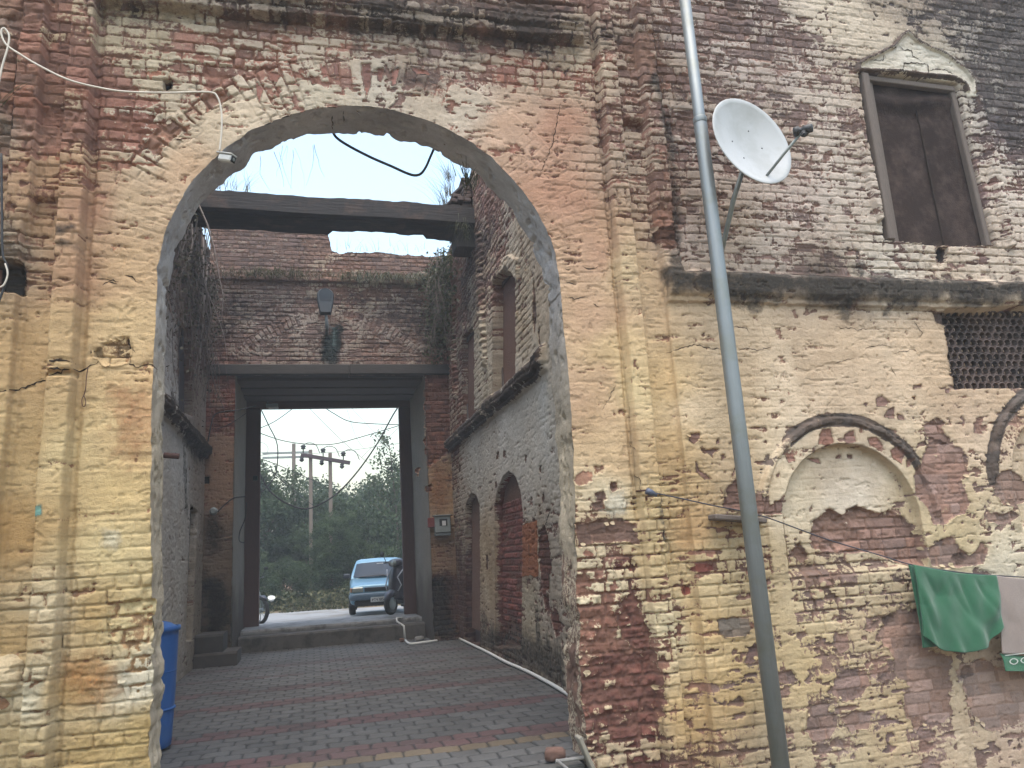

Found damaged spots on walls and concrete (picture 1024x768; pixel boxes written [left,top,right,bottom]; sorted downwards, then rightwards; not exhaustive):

peeling [361,62,430,98]
leakage [661,186,714,294]
leakage [727,262,1024,316]
crack [0,351,98,392]
spalling [91,335,132,367]
peeling [864,395,906,420]
peeling [573,470,641,548]
spalling [785,417,990,569]
peeling [986,469,1024,526]
spalling [687,563,714,573]
spalling [580,556,671,768]
spalling [805,605,1024,744]